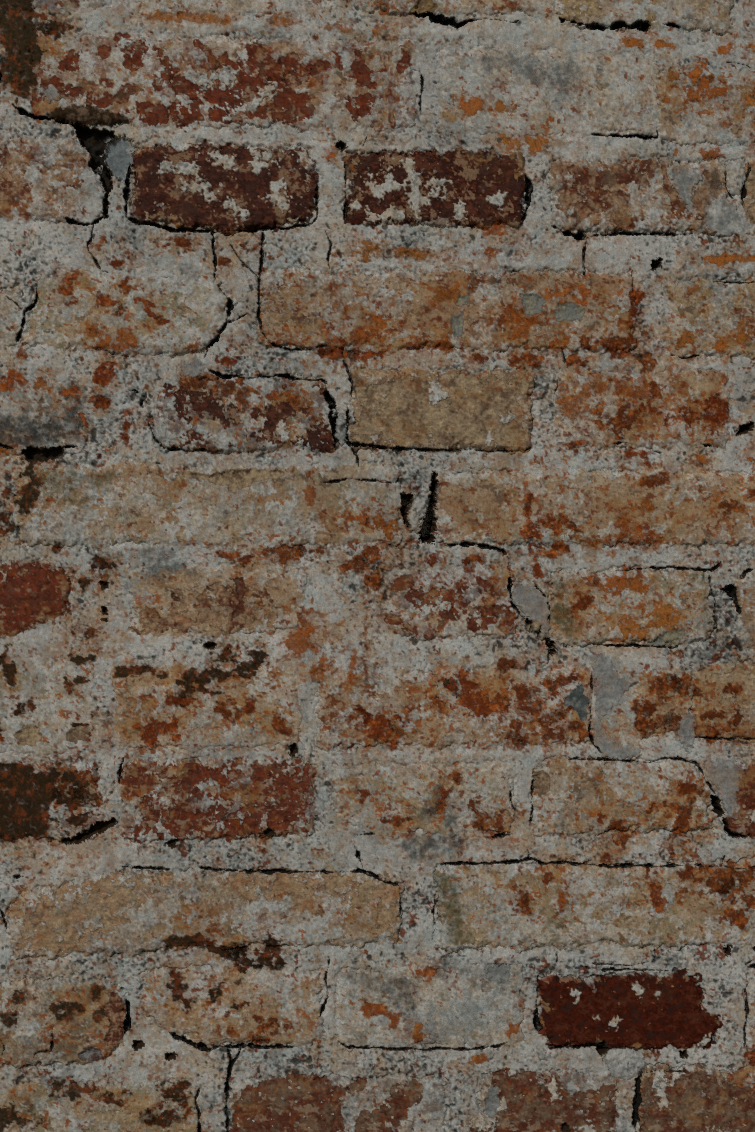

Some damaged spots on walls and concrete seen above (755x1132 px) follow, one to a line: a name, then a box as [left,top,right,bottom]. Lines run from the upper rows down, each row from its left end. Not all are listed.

crack [8,288,38,342]
crack [65,163,530,483]
crack [590,642,677,650]
crack [570,677,751,794]
crack [443,776,755,869]
crack [556,947,666,972]
crack [743,960,755,1046]